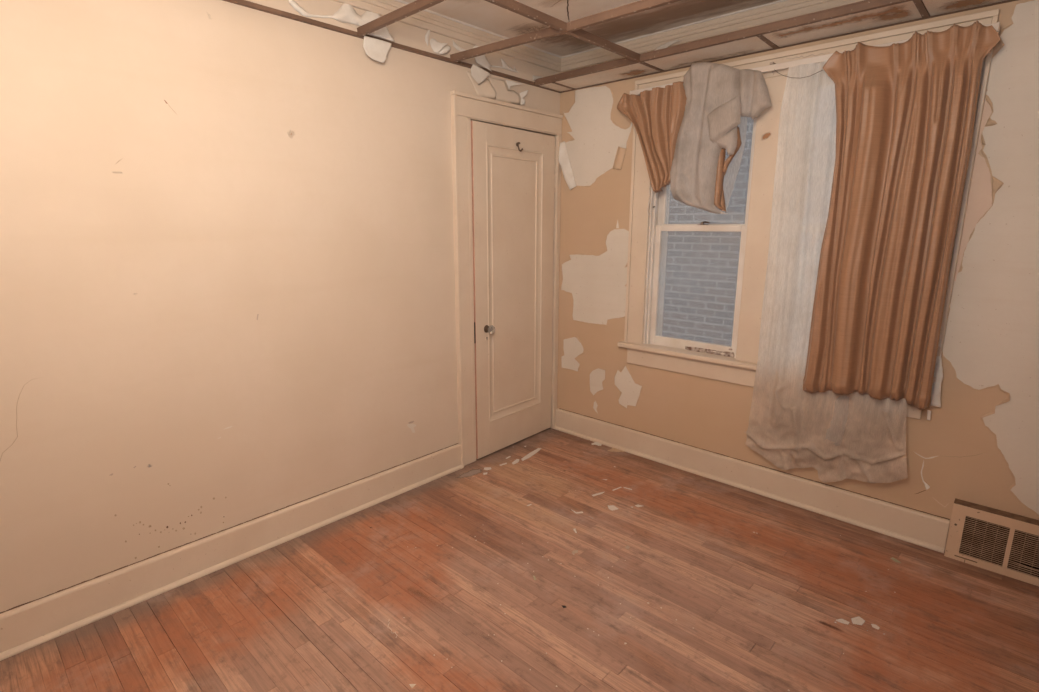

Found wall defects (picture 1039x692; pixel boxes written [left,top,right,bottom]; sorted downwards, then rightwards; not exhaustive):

flaking render [559,85,633,190]
flaking render [561,219,629,326]
flaking render [941,0,1039,520]
flaking render [561,336,643,415]